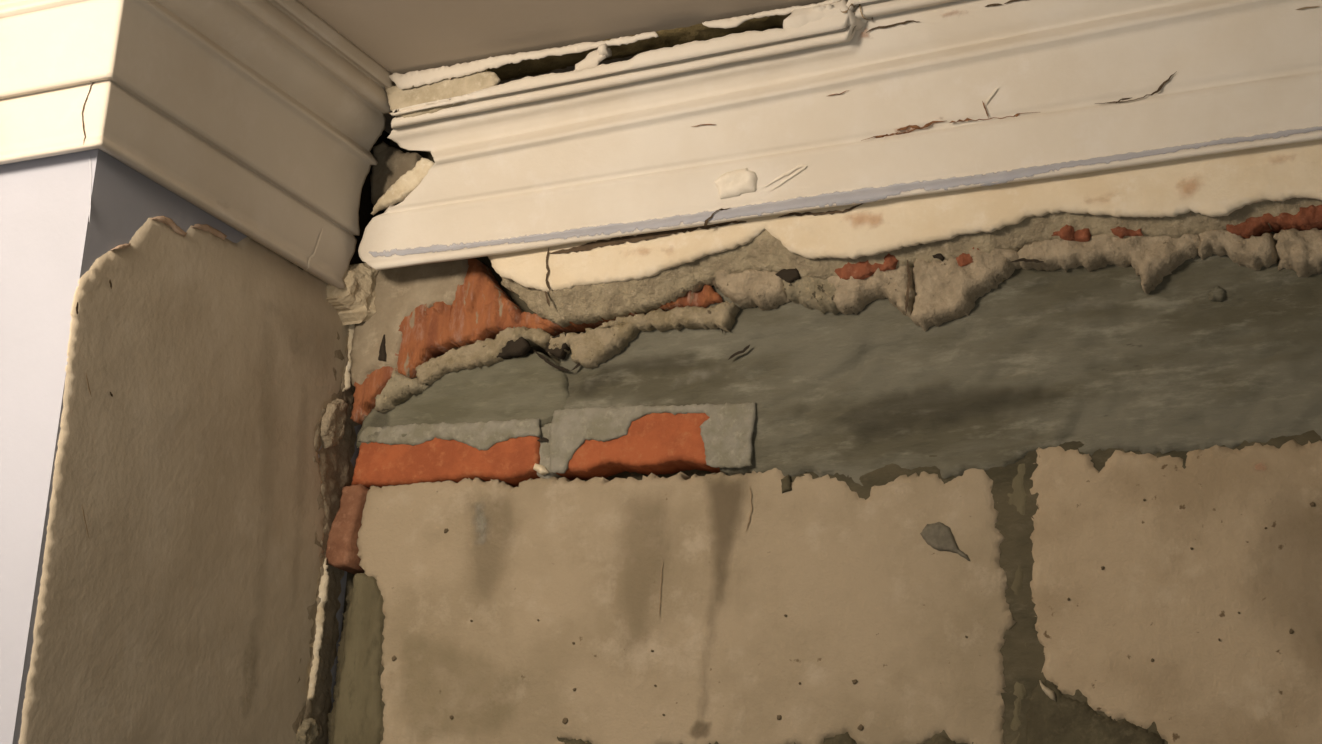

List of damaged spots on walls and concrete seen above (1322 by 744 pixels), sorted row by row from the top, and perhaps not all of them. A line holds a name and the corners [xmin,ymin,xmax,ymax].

peeling [486,0,868,81]
crack [82,82,94,144]
crack [861,101,1038,141]
crack [1095,71,1177,104]
flaking render [349,130,422,265]
crack [370,157,434,216]
peeling [715,168,757,199]
peeling [18,198,1322,744]